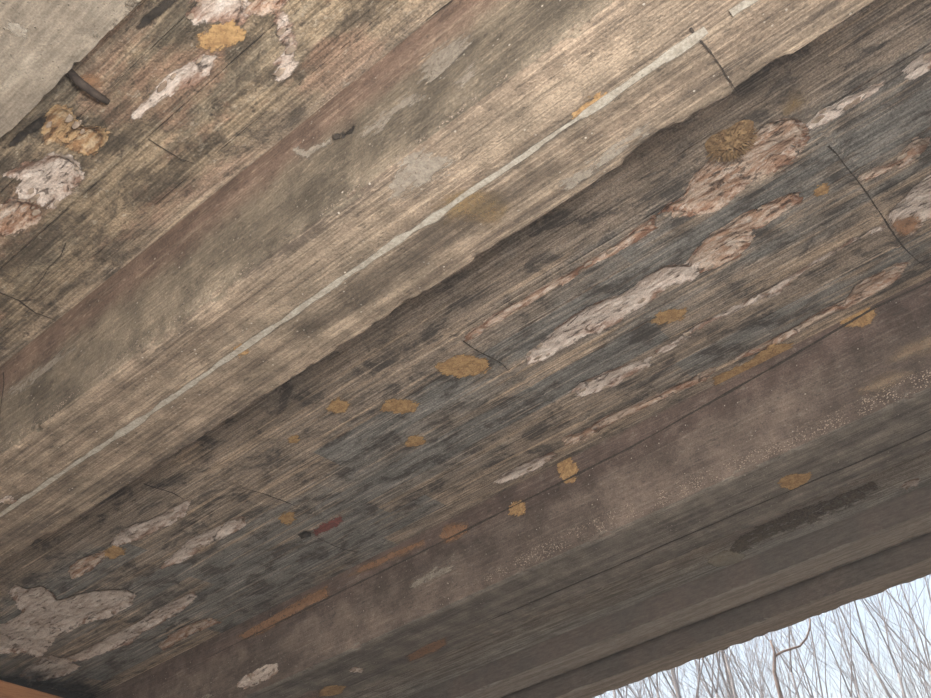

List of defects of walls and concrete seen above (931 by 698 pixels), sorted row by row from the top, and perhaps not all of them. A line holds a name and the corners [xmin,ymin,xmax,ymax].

spalling [185,0,299,81]
crack [689,27,737,91]
spalling [0,104,110,237]
spalling [464,80,908,366]
crack [827,146,927,268]
spalling [858,136,931,182]
crack [0,243,66,320]
spalling [571,175,931,397]
spalling [67,500,191,579]
spalling [0,585,197,681]
spalling [236,663,279,689]